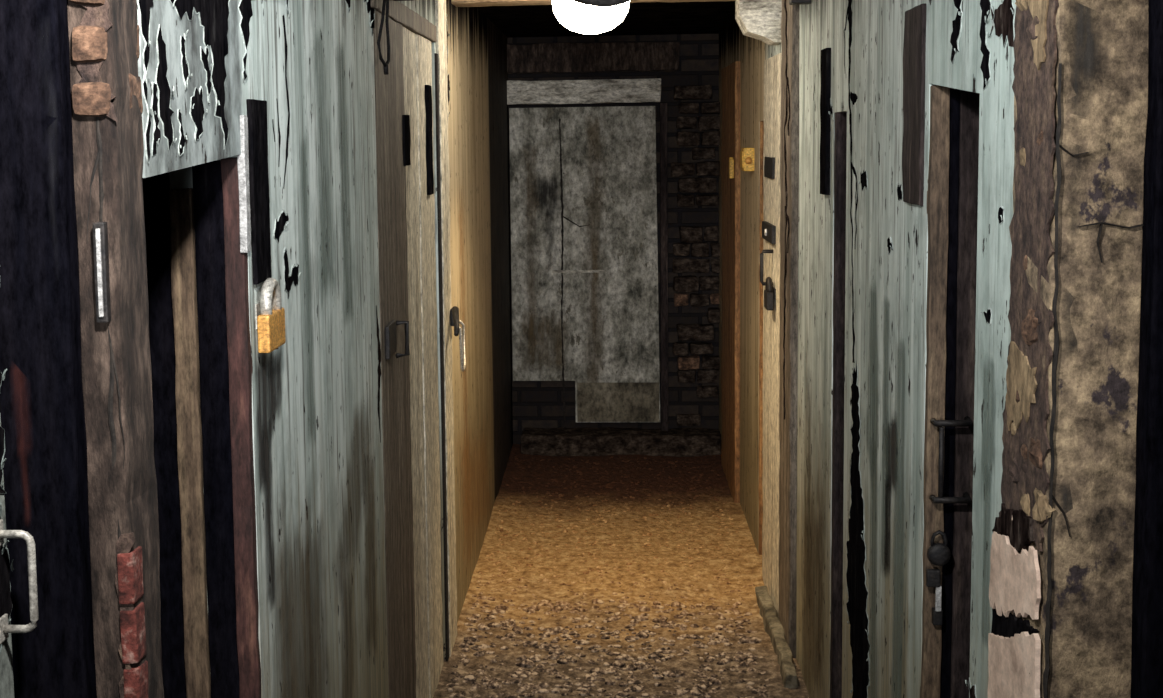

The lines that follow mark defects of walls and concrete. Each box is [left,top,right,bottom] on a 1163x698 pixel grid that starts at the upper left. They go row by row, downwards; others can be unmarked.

spalling [69,0,118,122]
peeling [129,0,266,165]
peeling [345,0,375,36]
peeling [950,0,963,64]
peeling [859,170,868,191]
spalling [979,0,1059,551]
crack [1043,63,1143,698]
peeling [0,541,14,625]
spalling [991,599,1039,638]